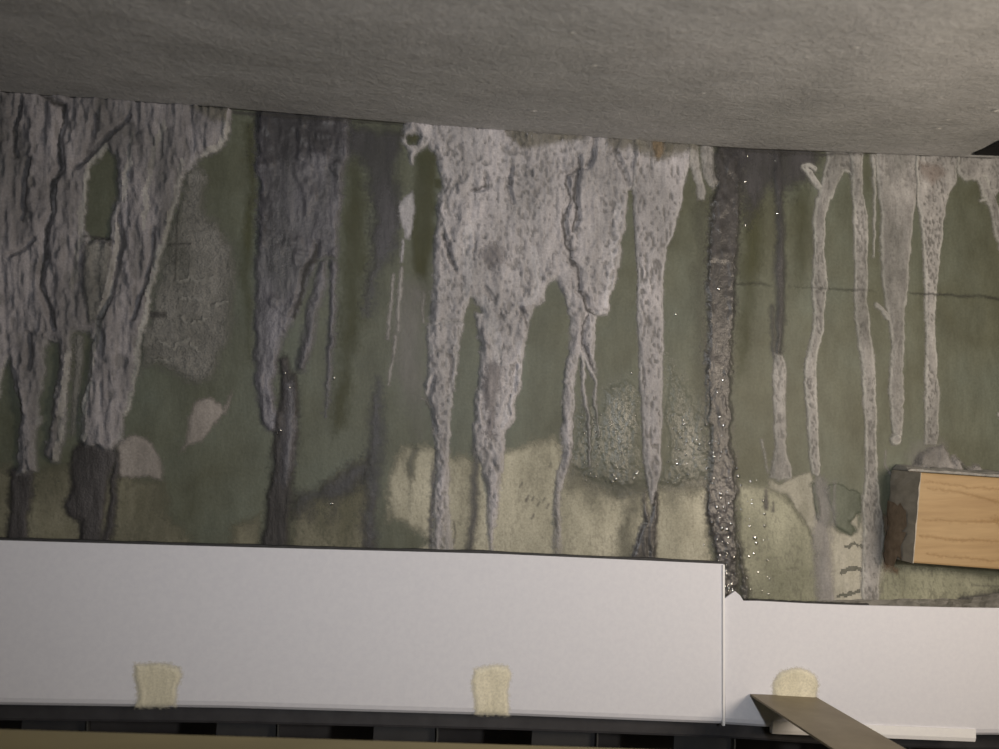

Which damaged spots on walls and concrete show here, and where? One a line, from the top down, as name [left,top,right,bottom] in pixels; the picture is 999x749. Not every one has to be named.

crack [13,95,66,325]
water stain [0,91,232,540]
crack [562,162,594,366]
water stain [253,112,999,600]